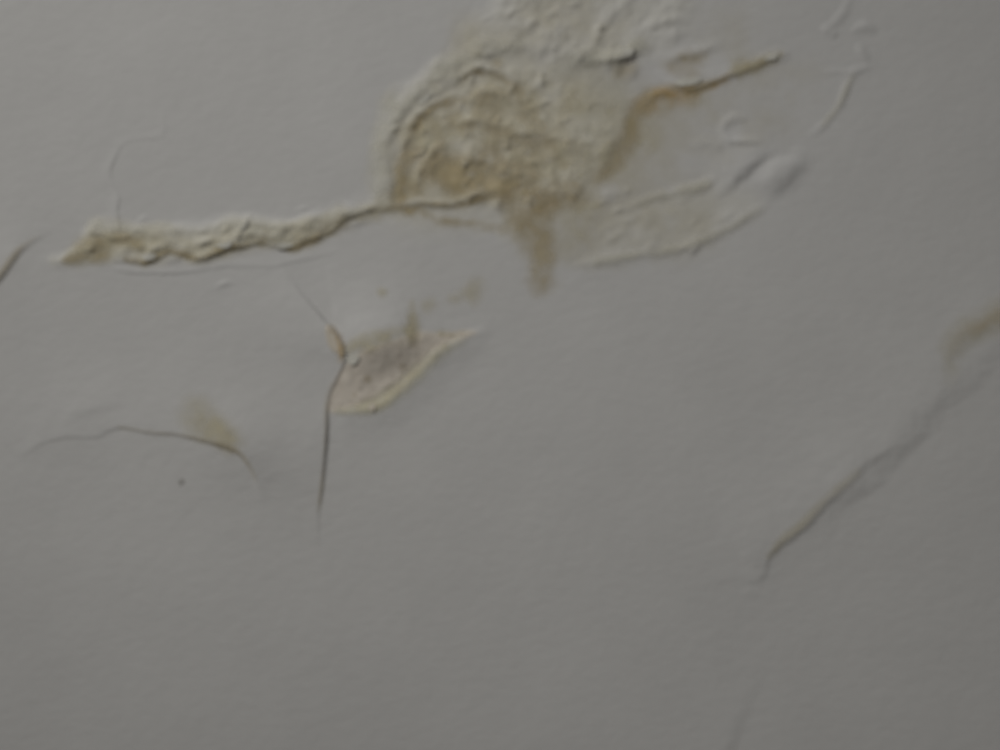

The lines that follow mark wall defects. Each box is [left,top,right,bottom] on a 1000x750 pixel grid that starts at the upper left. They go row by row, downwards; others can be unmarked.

spalling [41,186,499,450]
damp [286,232,322,250]